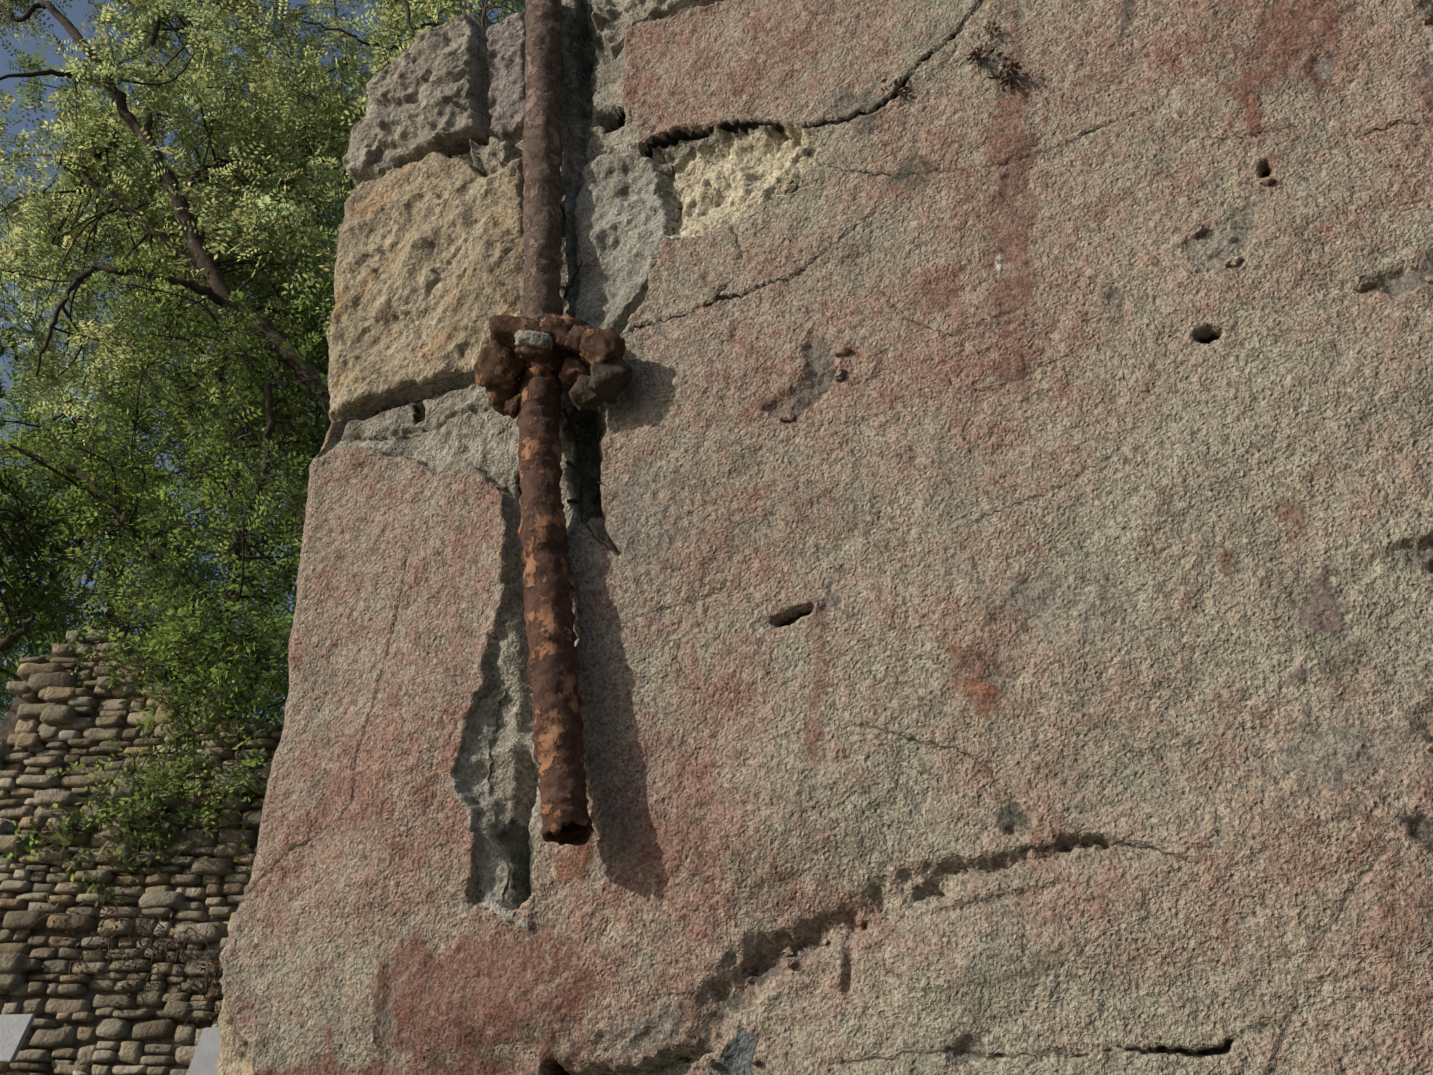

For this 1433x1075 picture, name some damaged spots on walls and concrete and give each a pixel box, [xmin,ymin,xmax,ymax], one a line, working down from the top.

spalling [652,122,822,239]
crack [638,14,1135,236]
crack [1192,125,1296,139]
crack [1364,120,1433,135]
crack [621,210,877,338]
crack [877,289,1018,336]
spalling [1353,256,1433,295]
spalling [1407,545,1433,574]
crack [237,529,413,909]
crack [841,838,1393,1075]